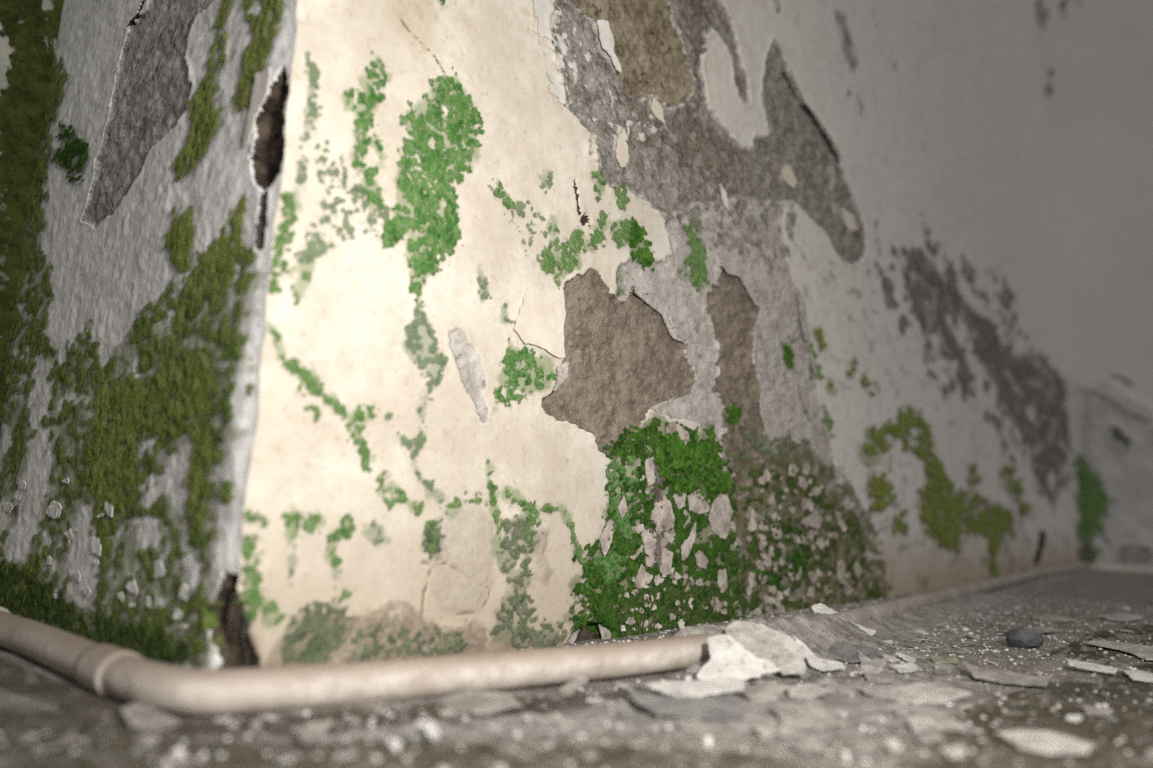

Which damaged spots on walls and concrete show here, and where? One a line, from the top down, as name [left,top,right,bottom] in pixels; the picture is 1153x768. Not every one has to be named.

peeling [81,0,214,228]
crack [244,66,289,250]
crack [783,64,843,163]
peeling [513,0,867,618]
leakage [868,212,1072,513]